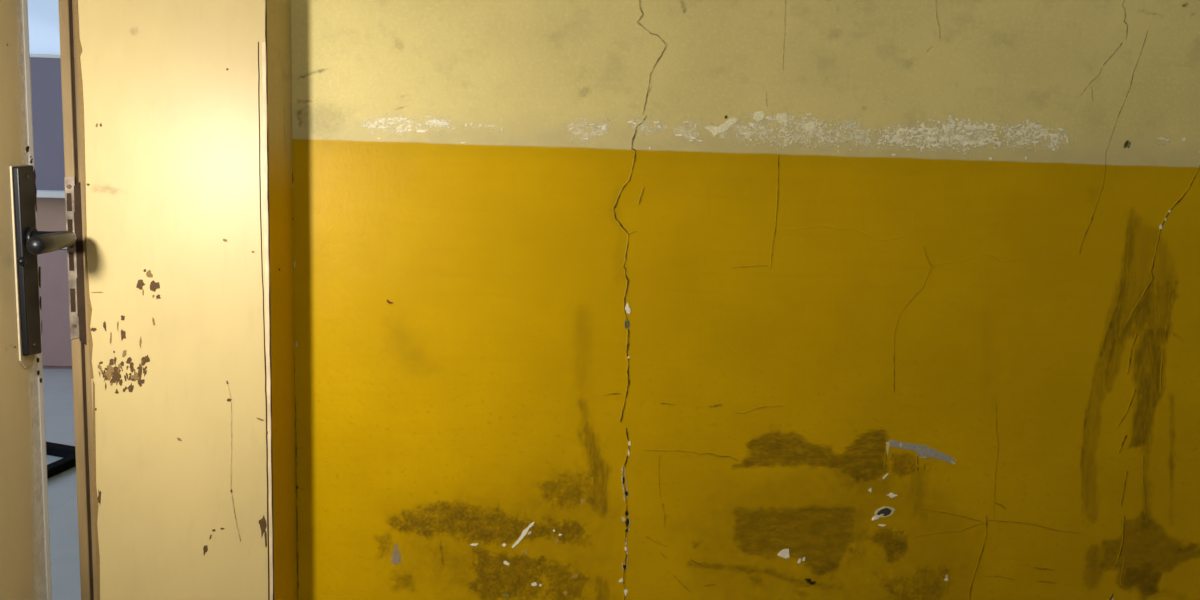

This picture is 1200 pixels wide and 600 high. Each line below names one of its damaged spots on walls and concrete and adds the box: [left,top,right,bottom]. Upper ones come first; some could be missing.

crack [603,0,668,600]
crack [1079,0,1148,255]
crack [1108,163,1200,600]